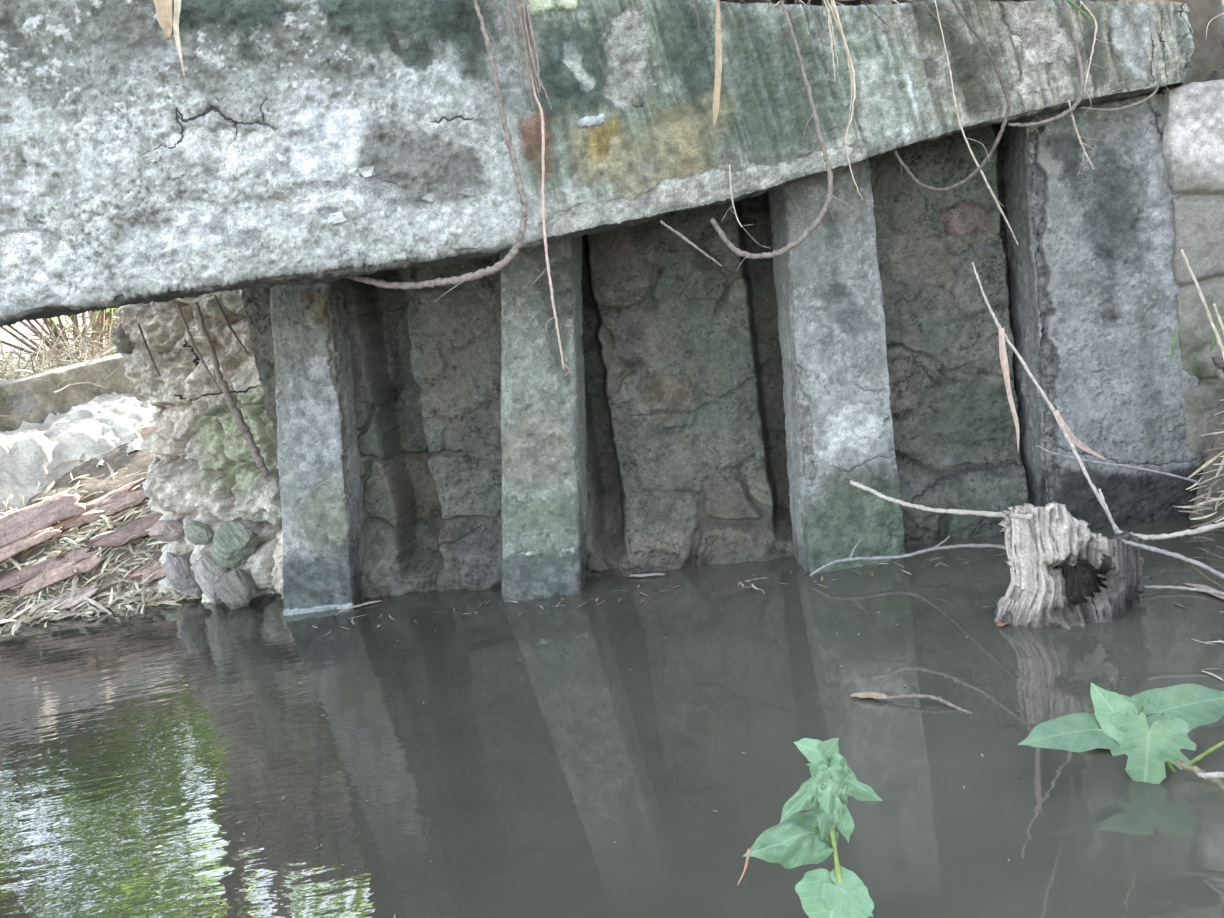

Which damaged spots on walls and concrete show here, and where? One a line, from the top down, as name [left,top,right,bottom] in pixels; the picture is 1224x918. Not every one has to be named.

crack [147,99,278,152]
water stain [172,0,293,60]
water stain [276,88,372,185]
water stain [318,0,499,77]
water stain [526,26,610,121]
water stain [852,54,901,147]
water stain [911,0,1001,111]
water stain [1077,1,1154,84]